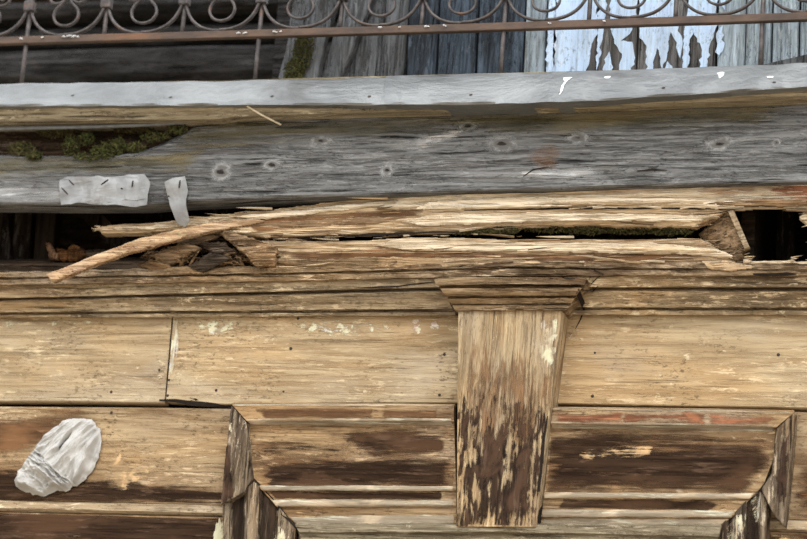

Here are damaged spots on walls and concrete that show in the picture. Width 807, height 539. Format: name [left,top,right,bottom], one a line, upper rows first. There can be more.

peeling [545,0,726,72]
crack [268,231,460,241]
crack [464,207,744,216]
crack [548,270,603,329]
leakage [0,445,245,539]
leakage [260,350,768,539]
leakage [775,435,789,506]